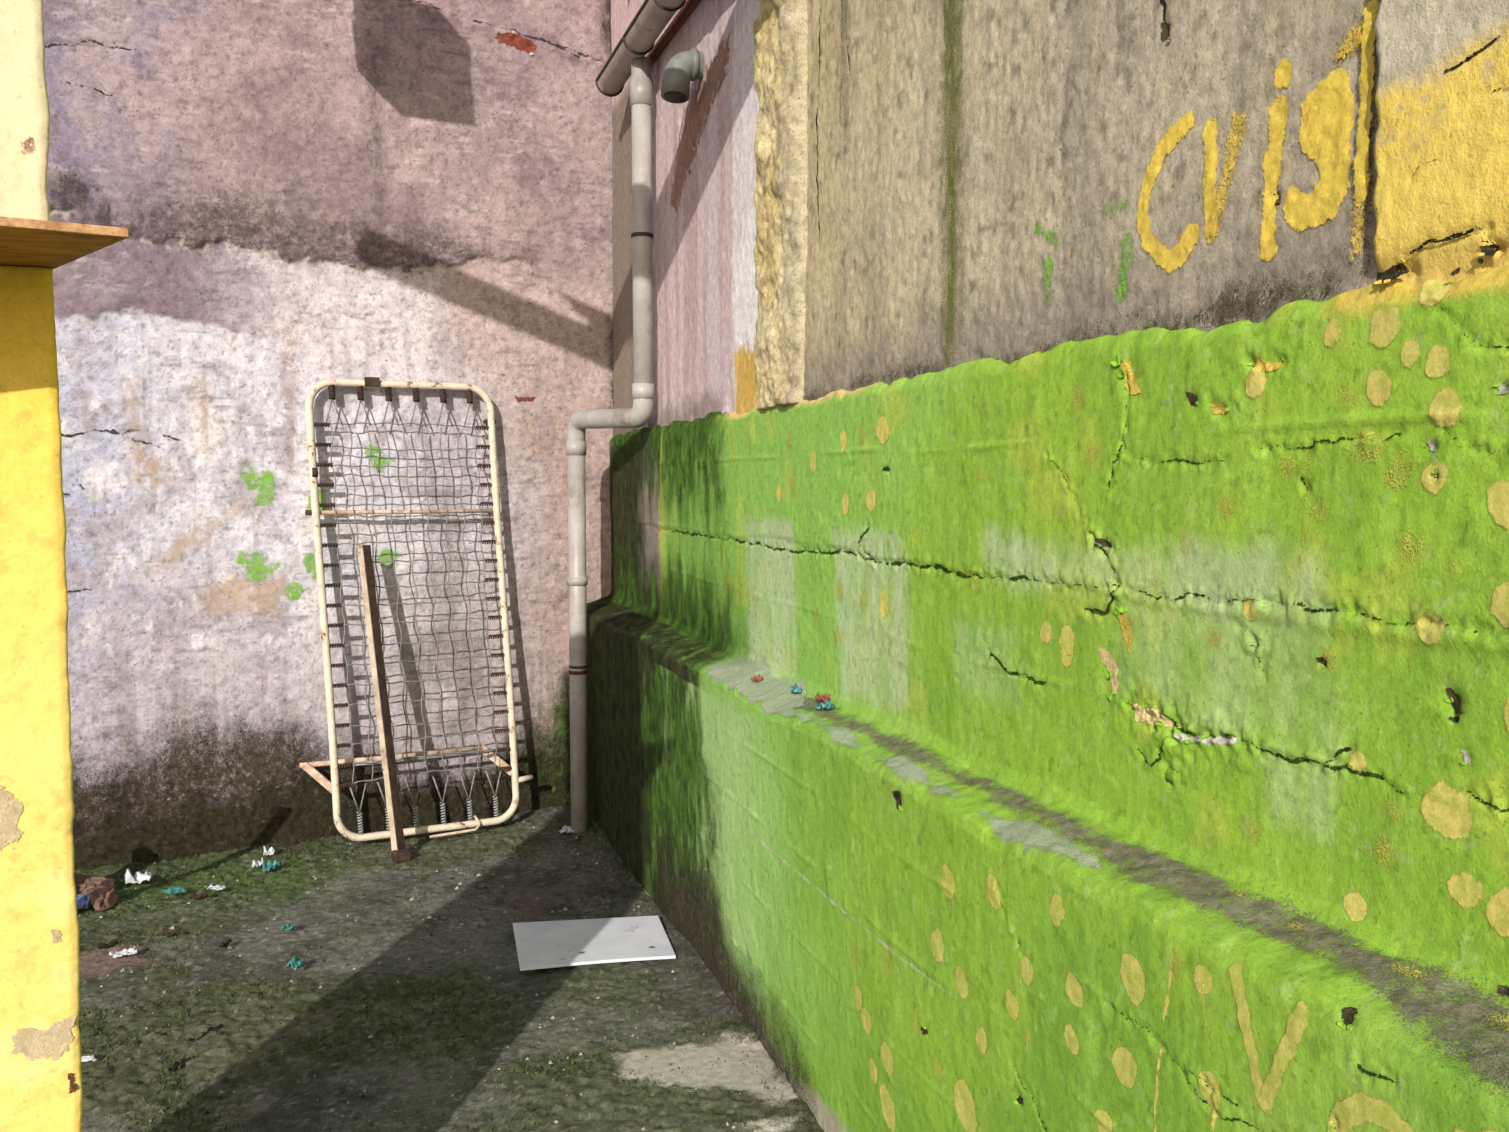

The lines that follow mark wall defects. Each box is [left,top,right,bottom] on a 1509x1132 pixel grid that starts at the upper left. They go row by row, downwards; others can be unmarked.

crack [409,0,601,61]
crack [45,39,136,96]
crack [1409,227,1509,255]
crack [667,460,1508,671]
damp [71,441,754,920]
crack [990,652,1046,685]
crack [1136,714,1405,794]
peeling [0,785,23,851]
crack [1467,786,1509,813]
peeling [11,1016,77,1094]